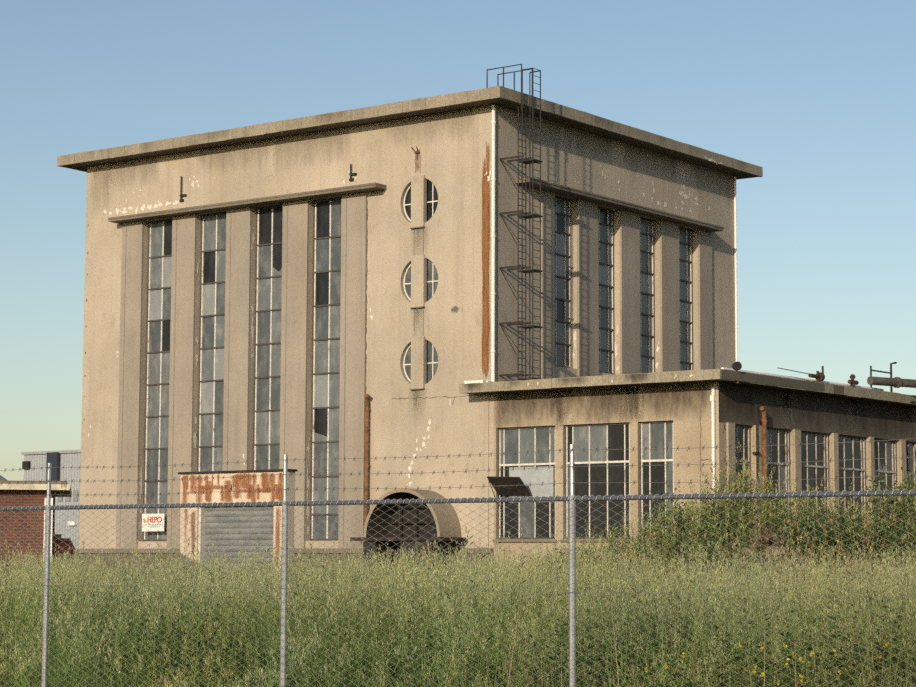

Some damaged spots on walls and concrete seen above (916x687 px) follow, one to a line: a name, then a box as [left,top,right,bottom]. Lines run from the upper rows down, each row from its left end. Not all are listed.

peeling [104,188,179,216]
rust [482,147,490,375]
peeling [407,419,431,486]
rust [182,473,283,563]